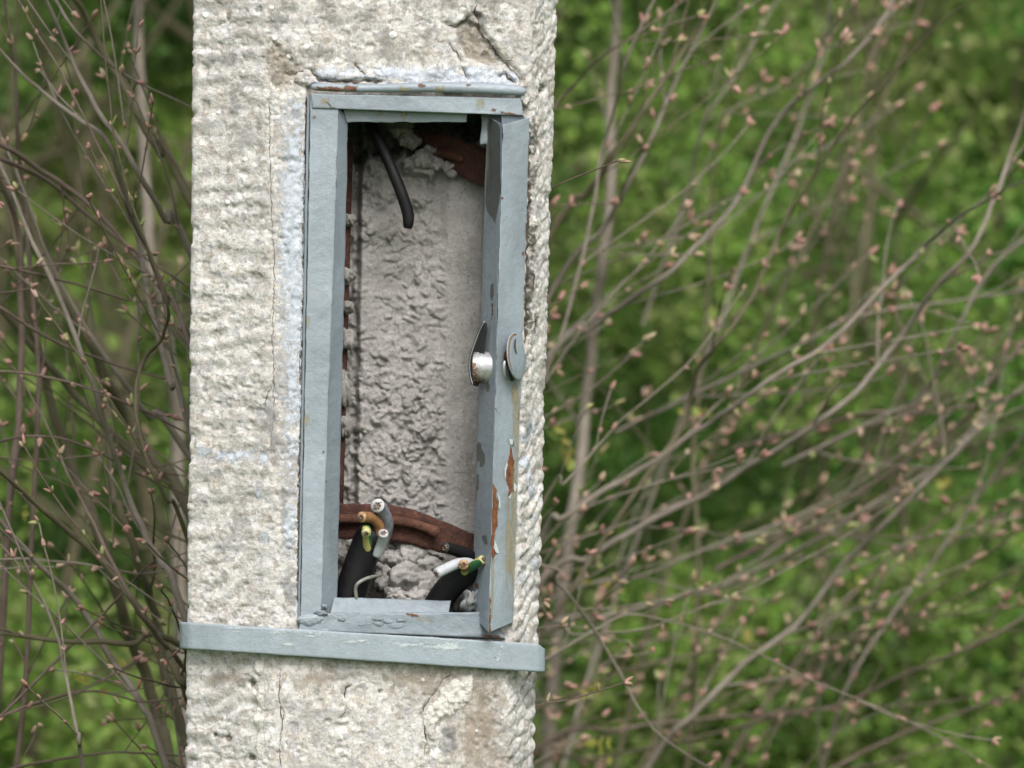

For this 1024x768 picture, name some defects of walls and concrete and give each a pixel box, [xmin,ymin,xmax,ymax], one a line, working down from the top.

crack [448,4,521,82]
corrosion [387,505,474,558]
crack [422,670,451,755]